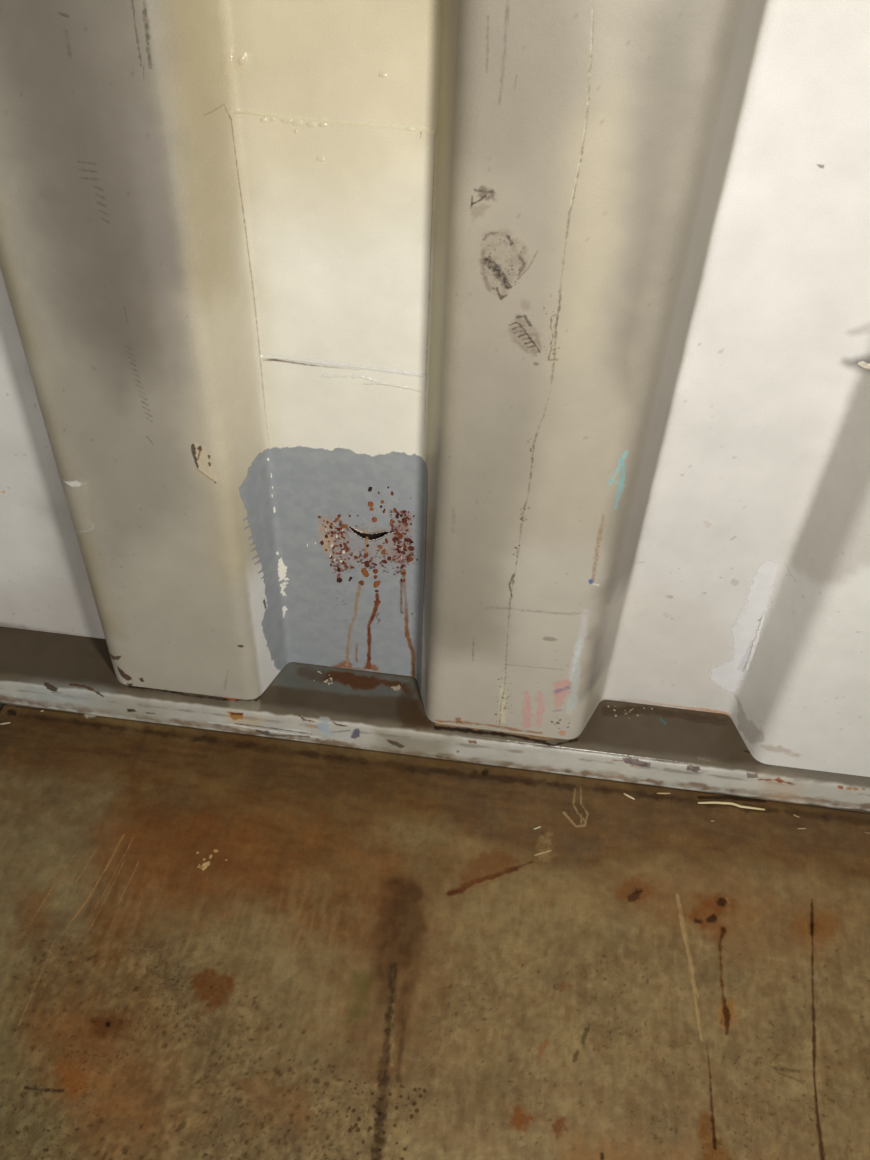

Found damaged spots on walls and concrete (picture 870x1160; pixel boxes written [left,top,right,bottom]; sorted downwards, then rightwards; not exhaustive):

corrosion [314,486,418,691]
peeling [710,561,778,692]